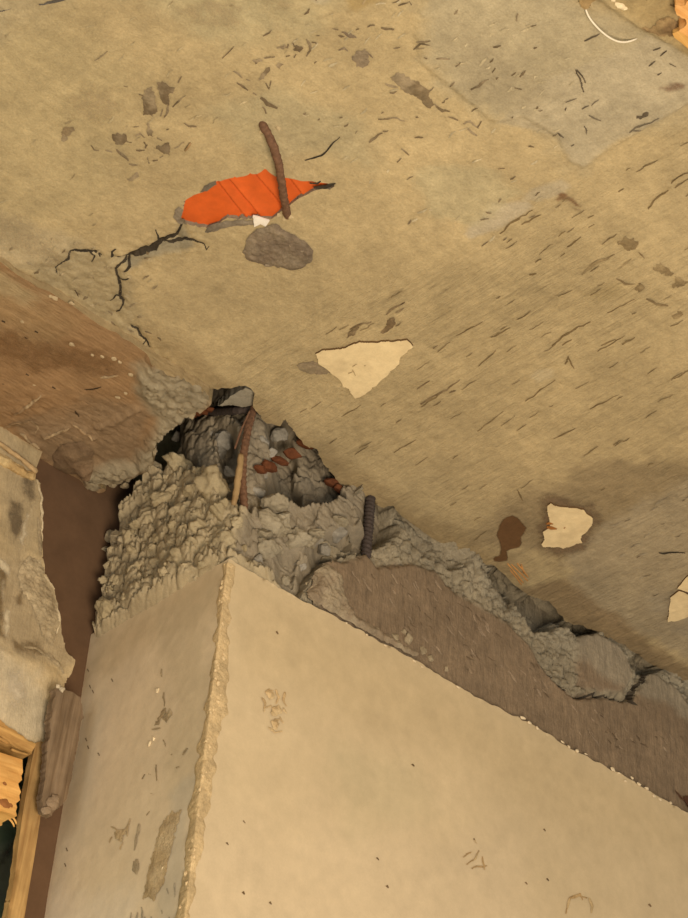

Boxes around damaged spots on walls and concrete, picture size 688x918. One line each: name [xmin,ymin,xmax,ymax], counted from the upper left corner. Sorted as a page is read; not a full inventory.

spalling [205,39,317,270]
spalling [173,207,187,225]
crack [55,224,209,347]
peeling [297,302,413,417]
spalling [421,380,460,407]
water stain [9,503,29,543]
peeling [541,502,593,549]
water stain [0,559,10,636]
peeling [667,575,688,622]
spalling [92,386,549,918]